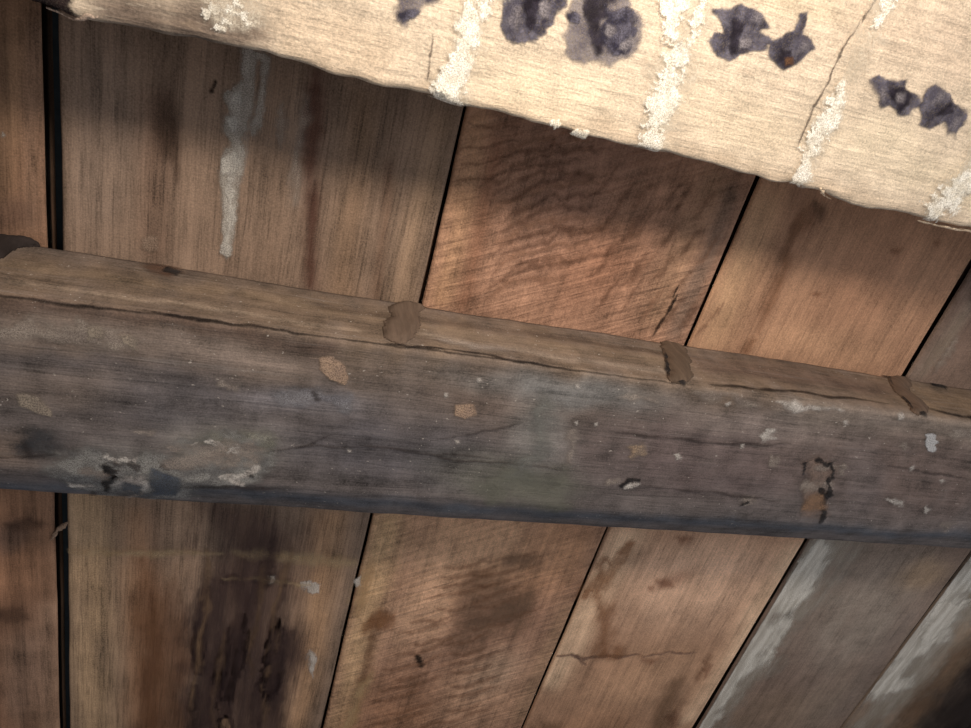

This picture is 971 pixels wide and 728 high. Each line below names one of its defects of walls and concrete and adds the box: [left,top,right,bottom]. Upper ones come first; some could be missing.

water stain [397,0,435,24]
water stain [501,0,642,66]
water stain [710,4,815,69]
crack [800,0,876,140]
water stain [871,75,968,133]
peeling [44,431,274,499]
water stain [192,505,305,728]
crack [557,652,691,664]
water stain [700,539,831,728]
water stain [853,589,971,728]